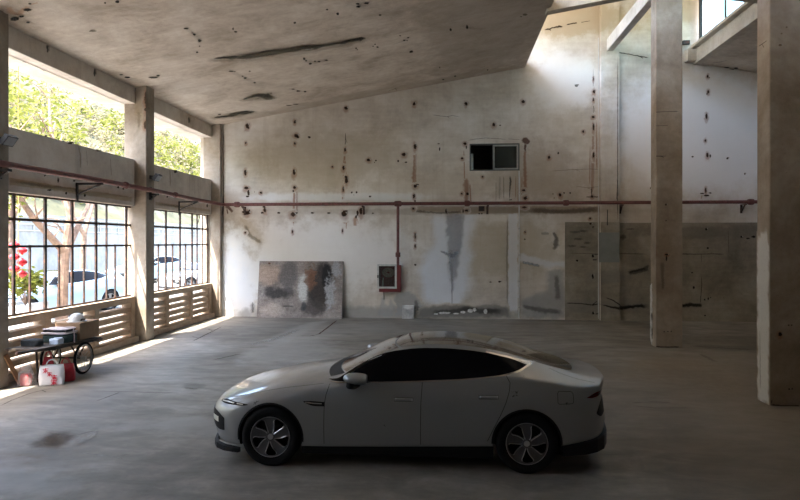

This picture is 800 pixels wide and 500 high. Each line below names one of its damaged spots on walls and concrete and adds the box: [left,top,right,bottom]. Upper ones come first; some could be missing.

leakage [377,176,598,320]